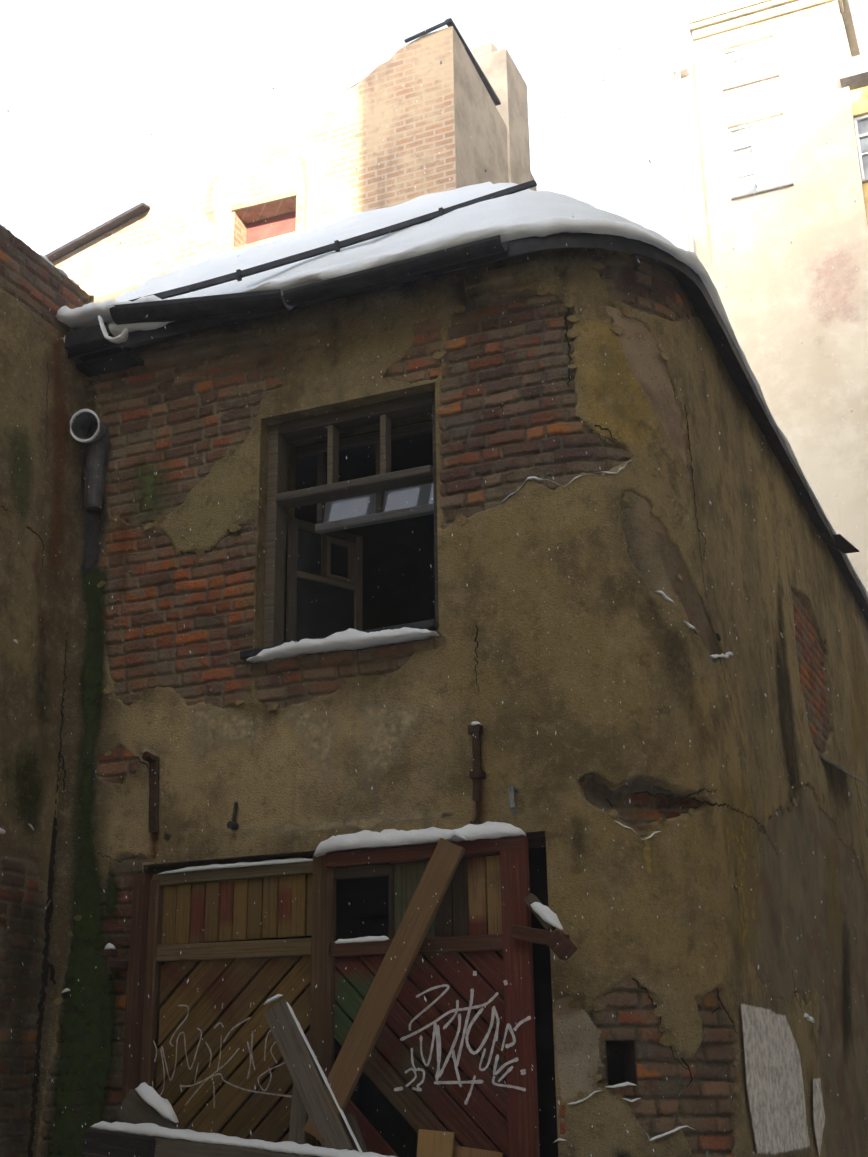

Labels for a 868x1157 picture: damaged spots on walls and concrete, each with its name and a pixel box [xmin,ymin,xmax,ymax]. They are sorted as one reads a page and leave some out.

flaking render [92,332,447,712]
flaking render [380,287,631,529]
crack [564,308,572,386]
crack [472,625,480,691]
flaking render [0,847,69,1157]
crack [28,634,67,1157]
flaking render [101,853,154,1123]
flaking render [581,776,701,839]
flaking render [555,976,741,1157]